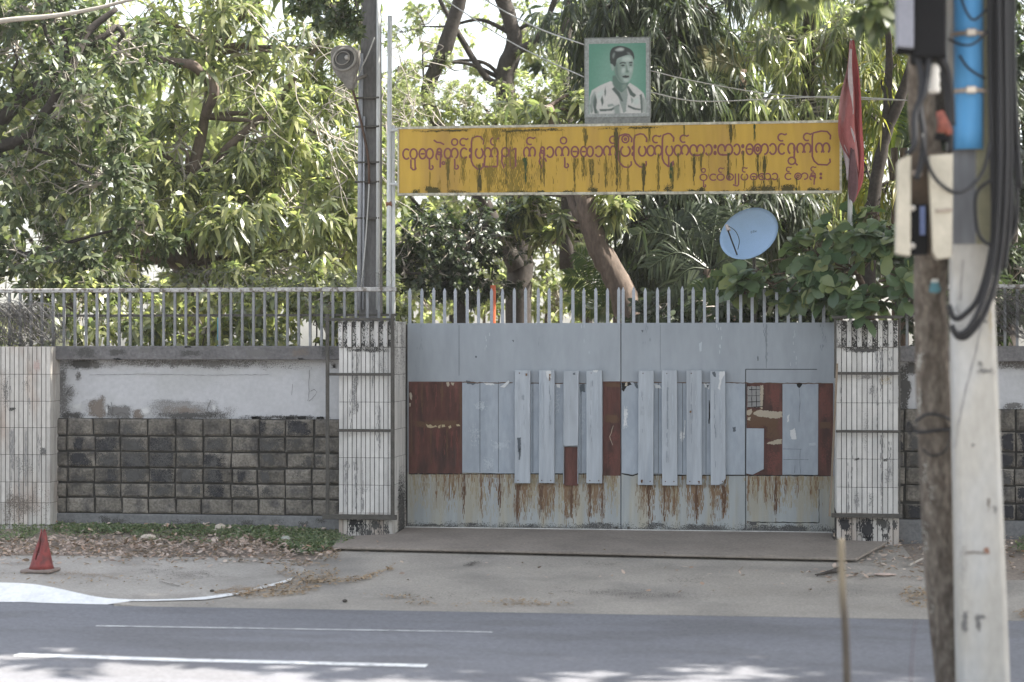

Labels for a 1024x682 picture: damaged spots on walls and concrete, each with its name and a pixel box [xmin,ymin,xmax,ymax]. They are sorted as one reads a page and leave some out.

leakage [59,321,405,498]